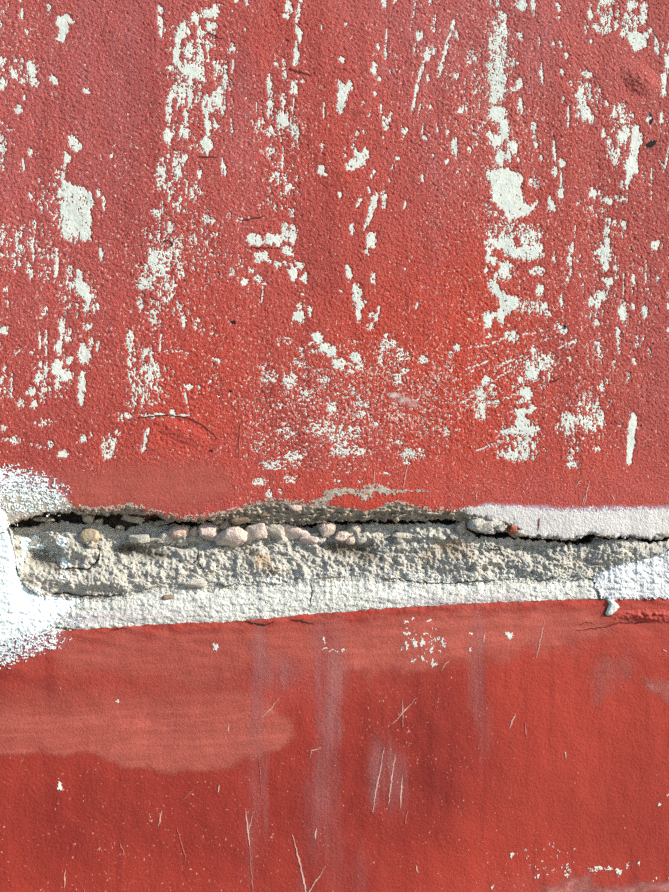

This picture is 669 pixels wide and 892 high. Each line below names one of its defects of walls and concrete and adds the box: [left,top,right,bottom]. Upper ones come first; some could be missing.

spalling [0,0,669,667]
crack [0,510,212,534]
crack [245,519,667,559]
crack [576,622,669,631]